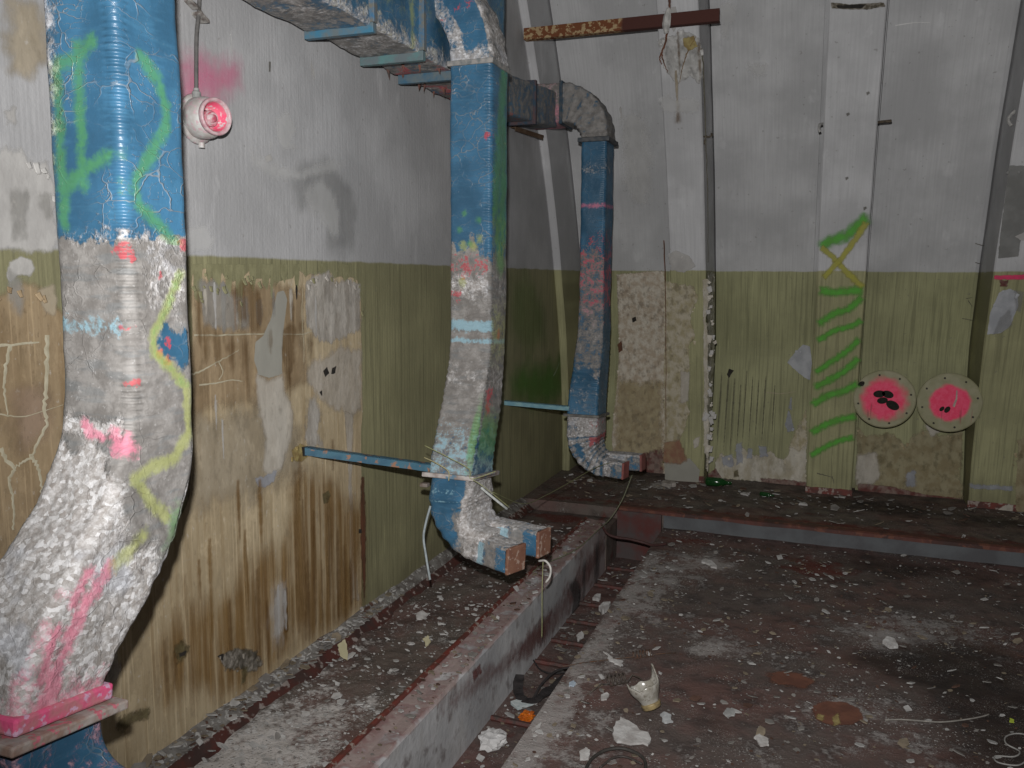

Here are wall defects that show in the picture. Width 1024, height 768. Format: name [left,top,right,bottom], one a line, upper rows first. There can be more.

corrosion [524,7,720,42]
crack [0,335,62,530]
peeling [101,264,600,768]
peeling [557,251,1024,541]